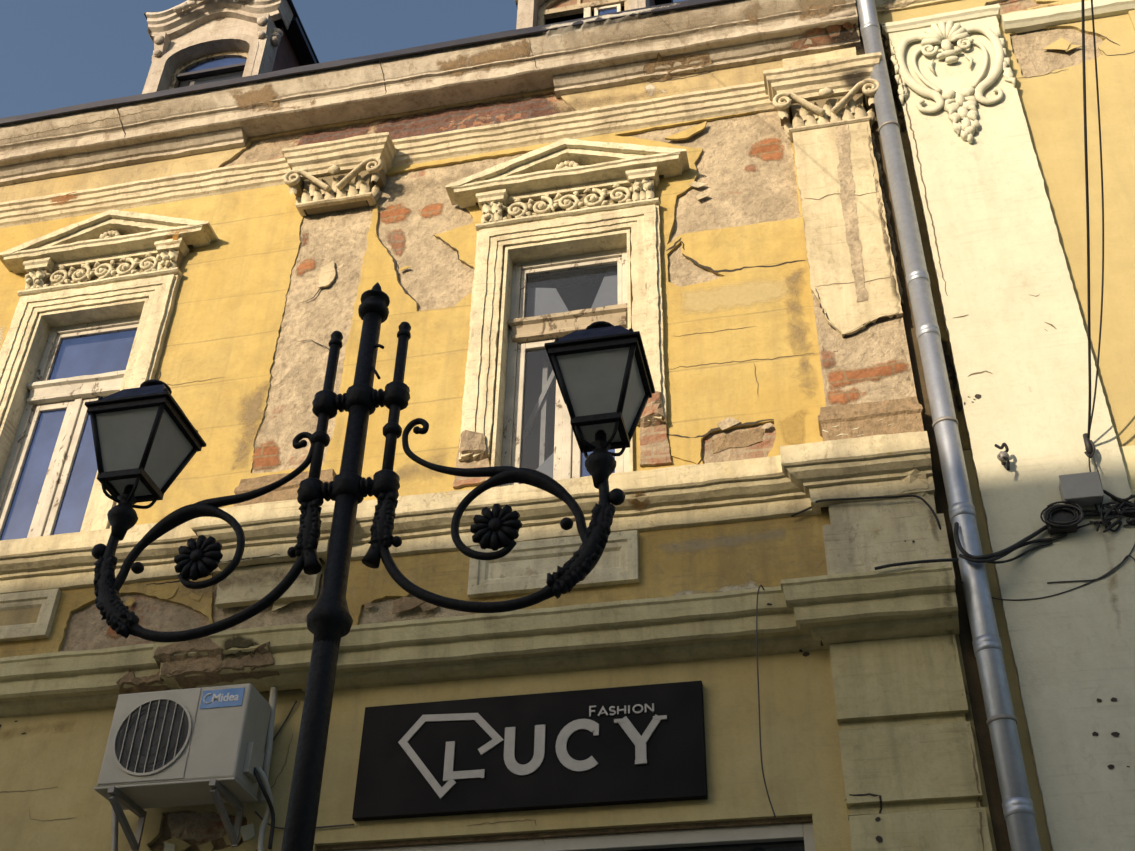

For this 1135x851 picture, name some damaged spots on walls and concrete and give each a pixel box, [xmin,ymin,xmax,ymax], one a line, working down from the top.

spalling [1010,28,1104,79]
crack [0,104,158,140]
spalling [223,93,574,167]
spalling [624,110,801,311]
crack [666,238,805,273]
spalling [813,124,917,406]
spalling [236,153,526,473]
crack [815,276,897,339]
spalling [453,430,491,489]
spalling [639,391,672,467]
spalling [702,412,805,464]
crack [0,787,71,821]